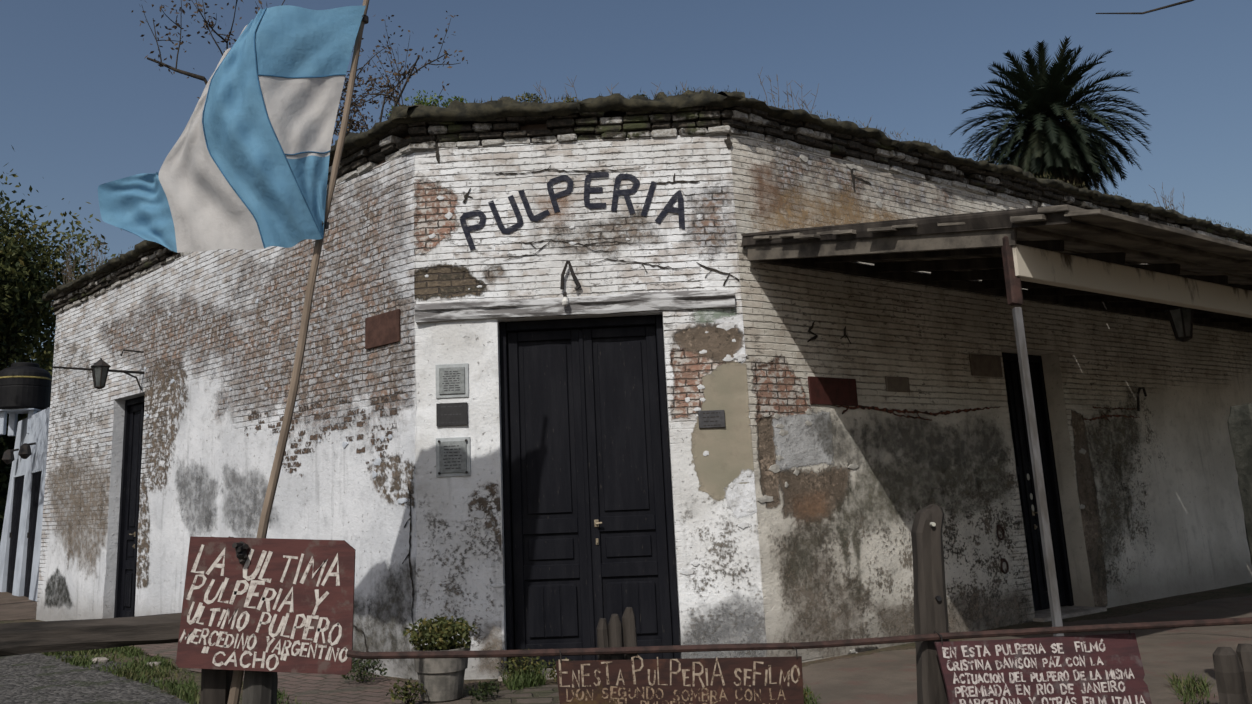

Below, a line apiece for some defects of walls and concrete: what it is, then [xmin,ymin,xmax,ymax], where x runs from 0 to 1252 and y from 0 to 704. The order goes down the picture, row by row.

flaking render [759,147,973,220]
water stain [45,453,110,607]
flaking render [51,338,108,459]
flaking render [101,160,505,664]
peeling [669,314,1000,658]
water stain [779,417,1027,652]
water stain [1088,394,1163,585]